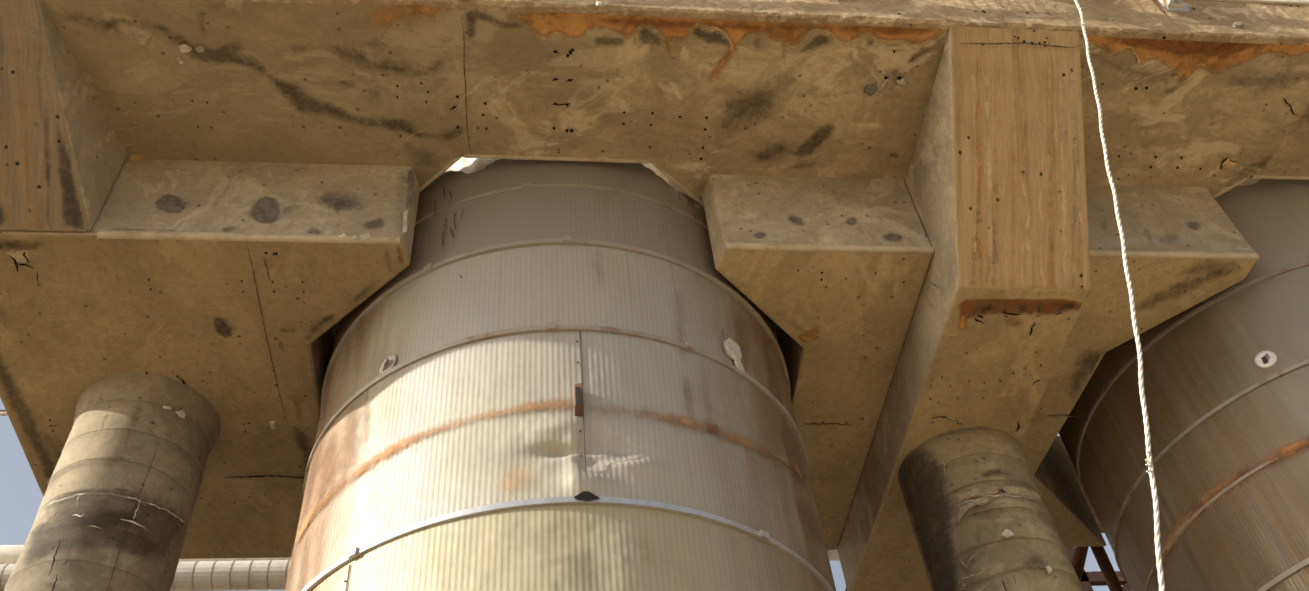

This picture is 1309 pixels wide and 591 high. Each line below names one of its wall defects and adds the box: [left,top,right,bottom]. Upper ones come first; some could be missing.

water stain [178,37,264,71]
rust [515,13,940,80]
rust [1087,36,1309,80]
water stain [276,80,412,132]
water stain [46,145,82,226]
water stain [156,195,183,212]
water stain [251,197,279,223]
rust [959,299,1081,330]
water stain [0,366,60,479]
rust [295,400,572,543]
water stain [30,493,185,553]
rust [1153,438,1309,574]